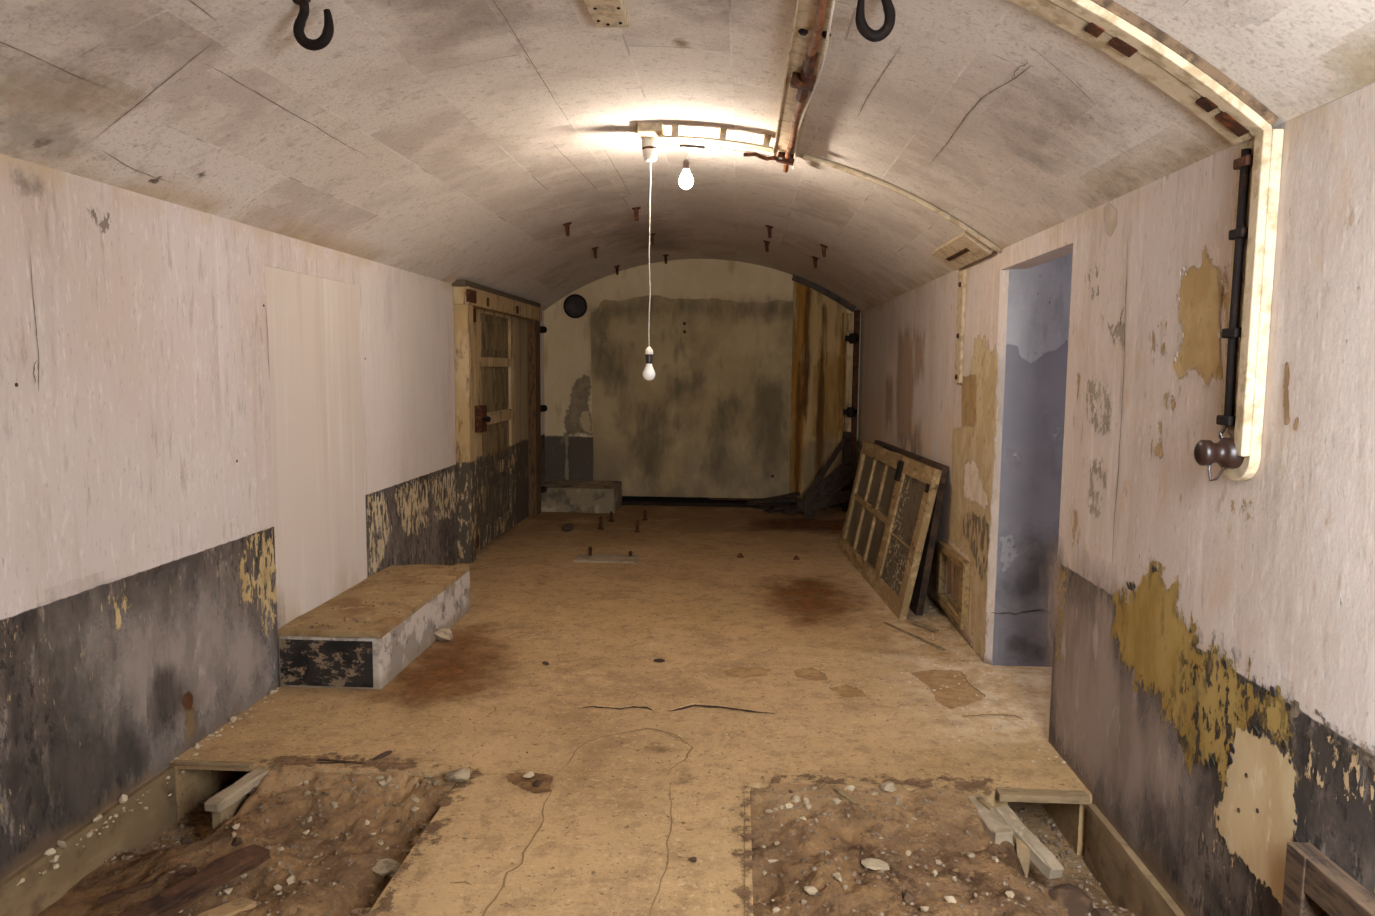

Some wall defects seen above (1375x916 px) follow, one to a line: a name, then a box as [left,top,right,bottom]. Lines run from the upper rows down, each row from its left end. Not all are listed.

crack [930,37,1084,164]
flaking render [1150,246,1229,460]
peeling [66,525,277,757]
peeling [367,468,457,573]
corrosion [372,630,499,705]
corrosion [766,579,848,623]
flaking render [948,335,1018,660]
peeling [1048,460,1375,907]
crack [450,696,775,916]